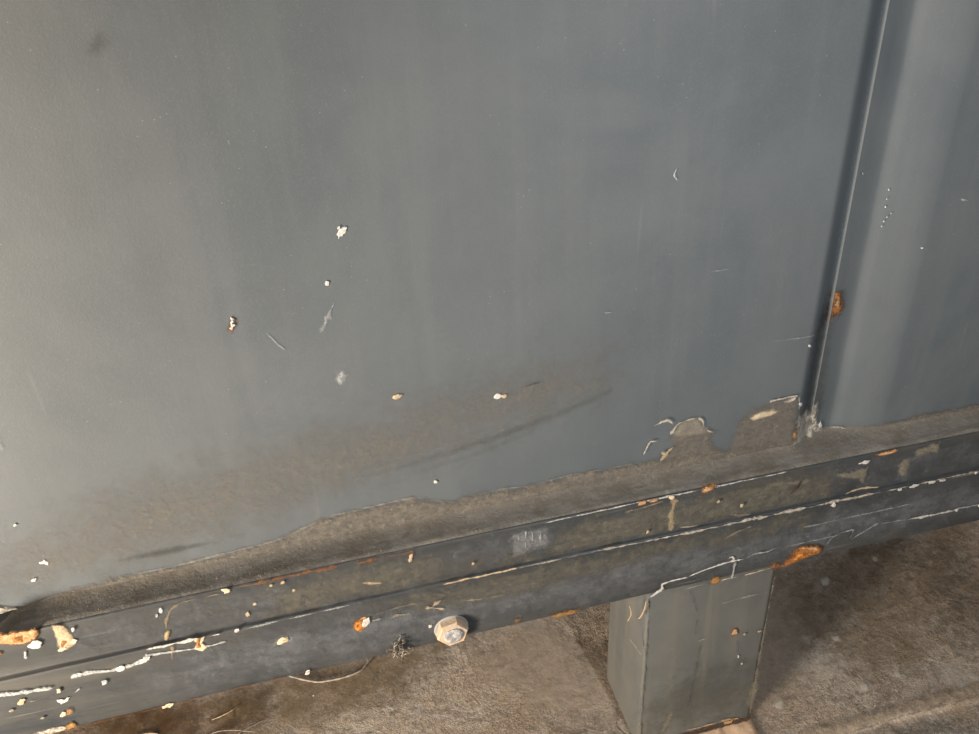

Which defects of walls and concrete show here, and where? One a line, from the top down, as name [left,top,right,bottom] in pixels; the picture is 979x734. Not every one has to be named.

rust [823,291,845,323]
peeling [898,442,940,476]
peeling [840,460,878,494]
rust [770,544,823,569]
peeling [353,616,370,632]
peeling [52,626,77,652]
peeling [194,637,207,651]
peeling [57,689,79,717]
leakage [56,654,421,734]